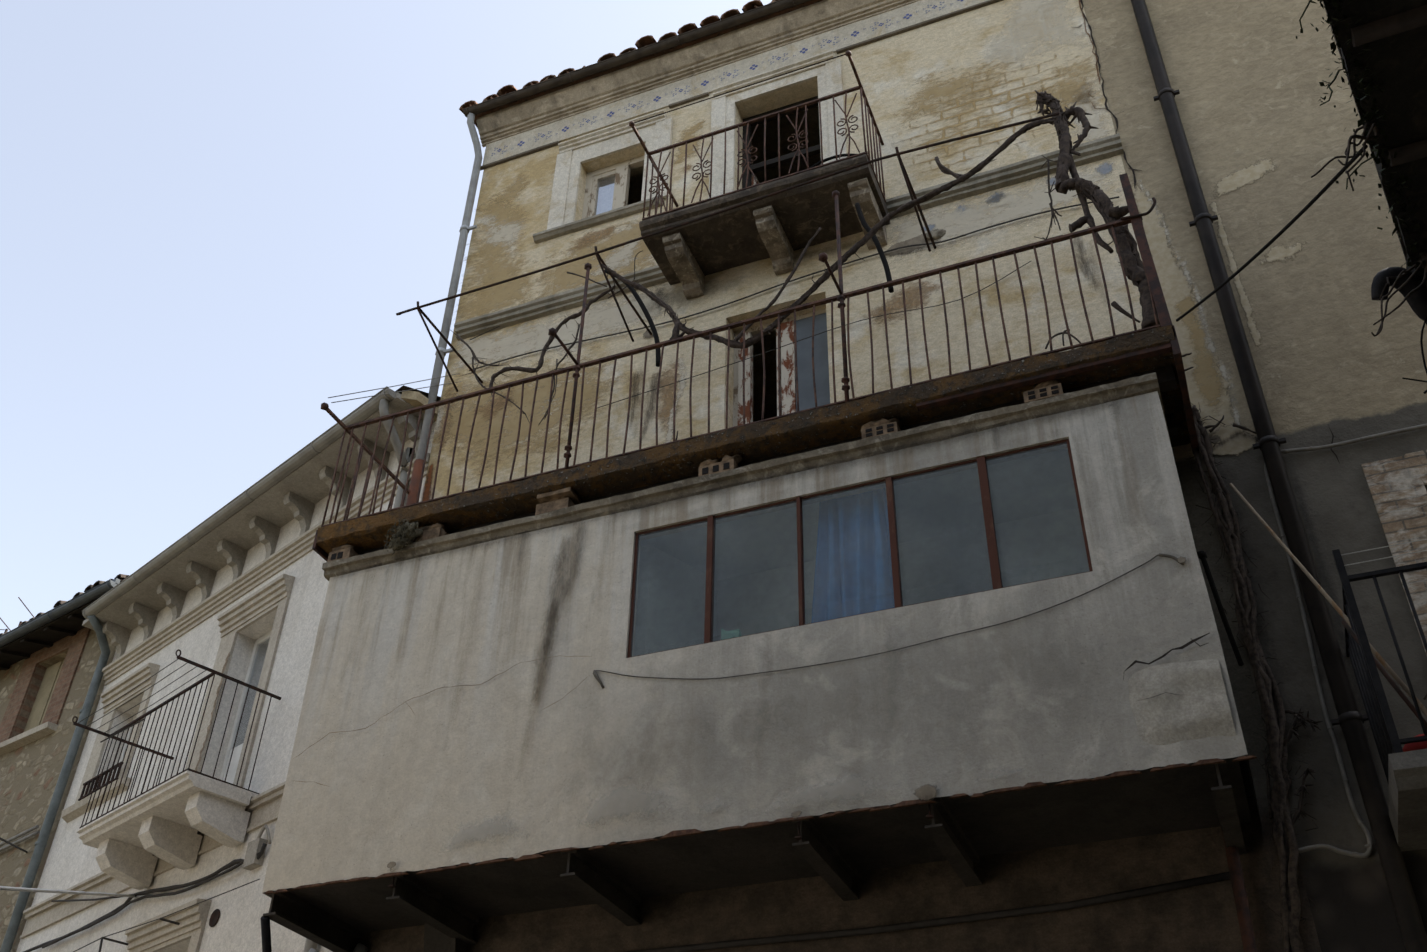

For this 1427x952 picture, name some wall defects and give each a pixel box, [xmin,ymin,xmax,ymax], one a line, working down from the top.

peeling [904,0,1108,170]
spalling [1120,184,1256,456]
peeling [1209,158,1276,346]
peeling [1260,242,1307,265]
damp [536,588,563,693]
crack [1123,633,1209,701]